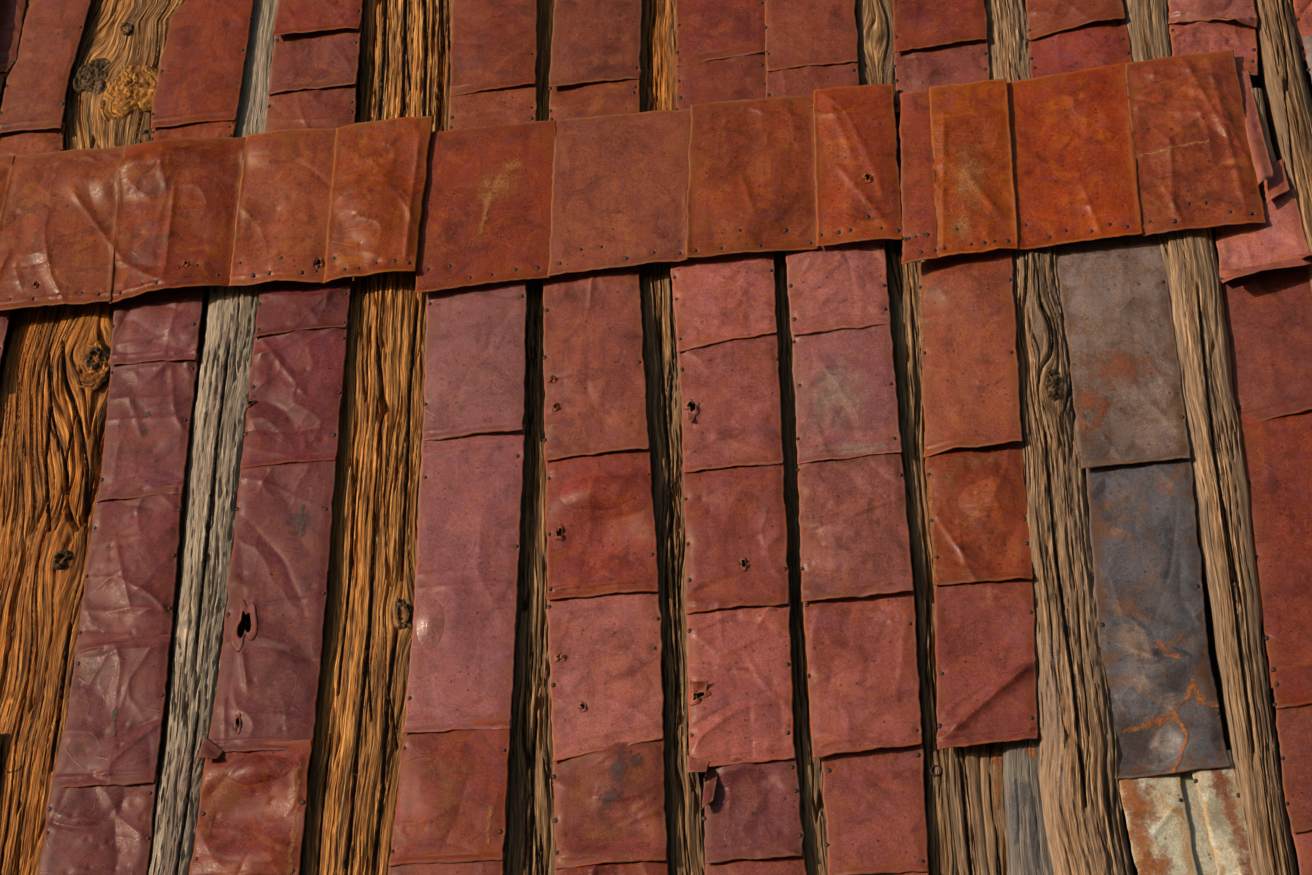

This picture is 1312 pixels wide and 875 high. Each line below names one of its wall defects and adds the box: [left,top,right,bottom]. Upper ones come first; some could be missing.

rust [1122,676,1219,773]
rust [1121,778,1171,875]
rust [1211,768,1253,875]